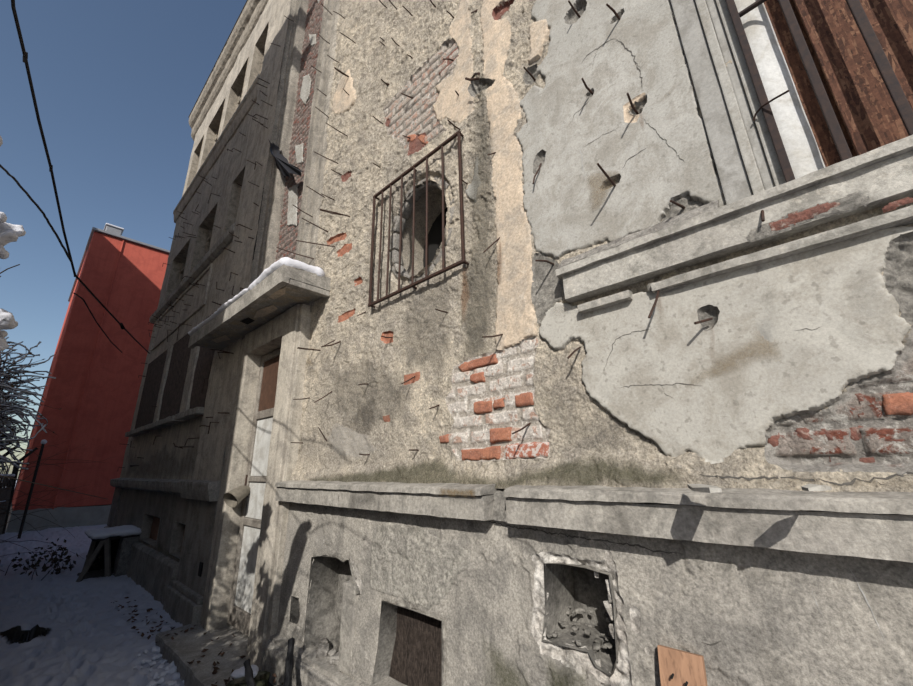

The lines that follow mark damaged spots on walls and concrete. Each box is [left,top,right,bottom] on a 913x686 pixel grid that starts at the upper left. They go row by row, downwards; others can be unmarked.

crack [584,38,645,87]
crack [624,123,684,166]
peeling [383,0,564,462]
spalling [747,192,870,243]
flaking render [380,331,394,344]
flaking render [764,231,913,475]
spalling [530,550,641,686]